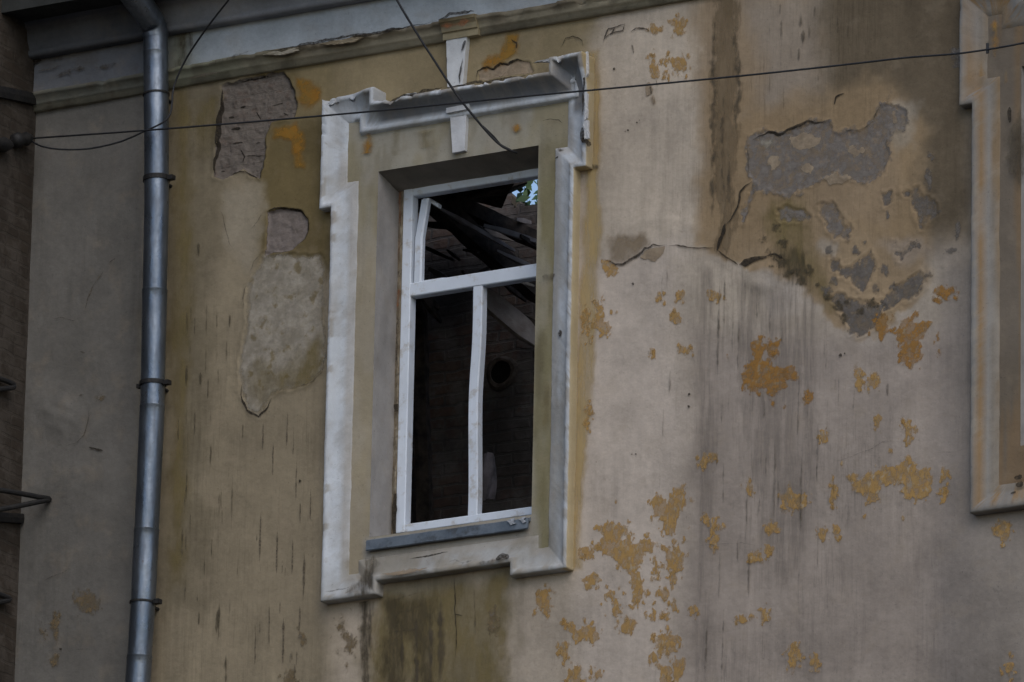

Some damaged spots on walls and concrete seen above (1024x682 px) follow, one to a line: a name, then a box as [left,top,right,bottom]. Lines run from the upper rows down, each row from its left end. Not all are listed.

spalling [213,72,297,179]
spalling [579,51,591,147]
peeling [645,50,690,104]
water stain [710,0,741,253]
crack [604,150,785,266]
flaking render [741,102,959,369]
flaking render [241,207,326,417]
peeling [741,335,799,409]
peeling [828,419,952,518]
water stain [330,557,506,682]
peeling [532,583,605,682]
peeling [578,483,699,682]